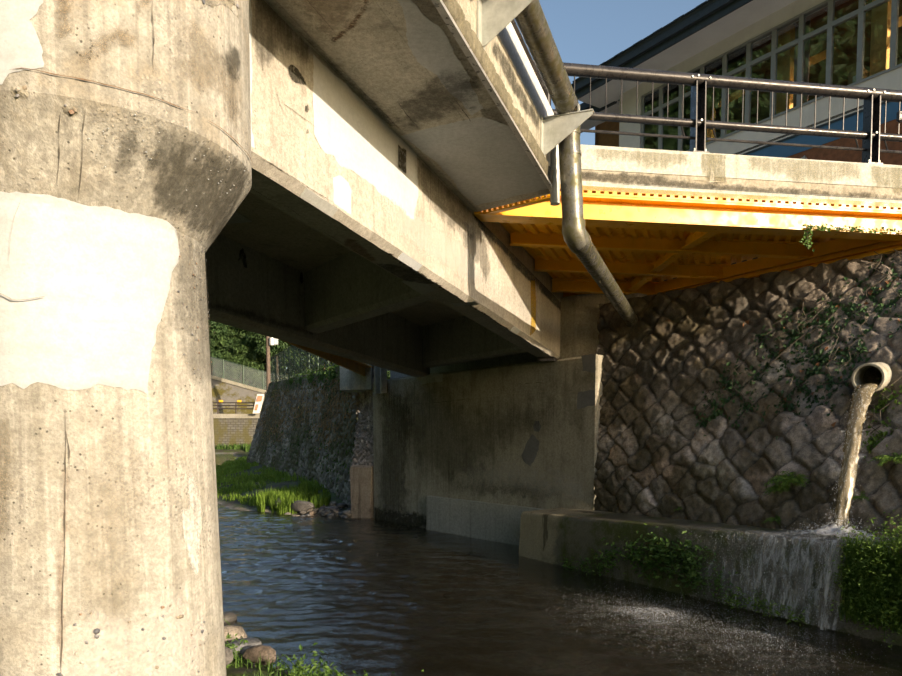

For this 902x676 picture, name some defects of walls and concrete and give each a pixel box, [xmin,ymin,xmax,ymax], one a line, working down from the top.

spalling [201,0,239,19]
water stain [226,48,240,78]
water stain [142,132,245,240]
water stain [374,395,426,530]
crack [60,420,70,673]